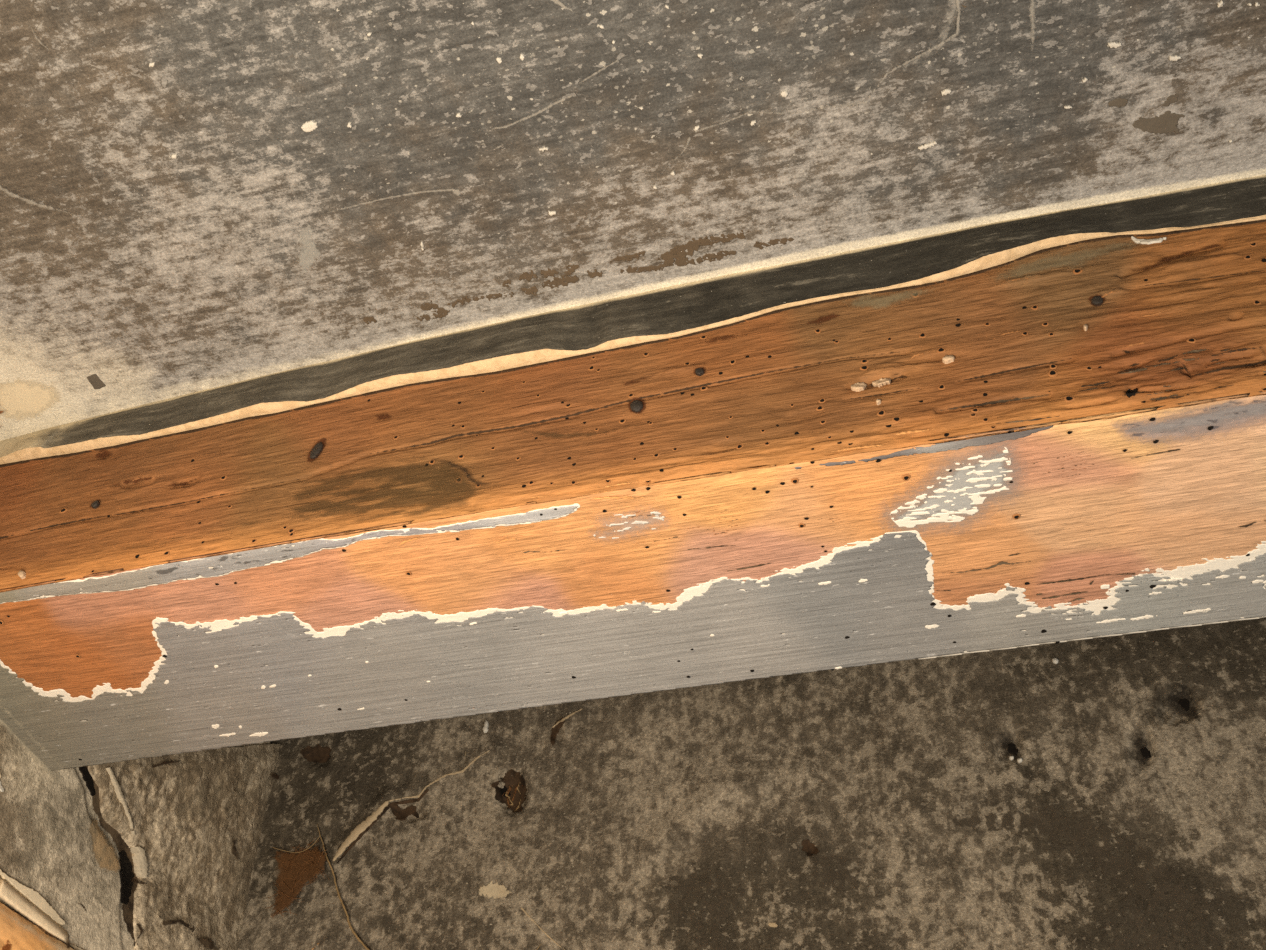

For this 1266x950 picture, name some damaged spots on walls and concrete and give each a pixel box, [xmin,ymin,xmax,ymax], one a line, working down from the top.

peeling [0,426,1266,771]
crack [0,877,86,948]
crack [64,766,138,946]
water stain [662,863,745,950]
water stain [953,804,1213,934]